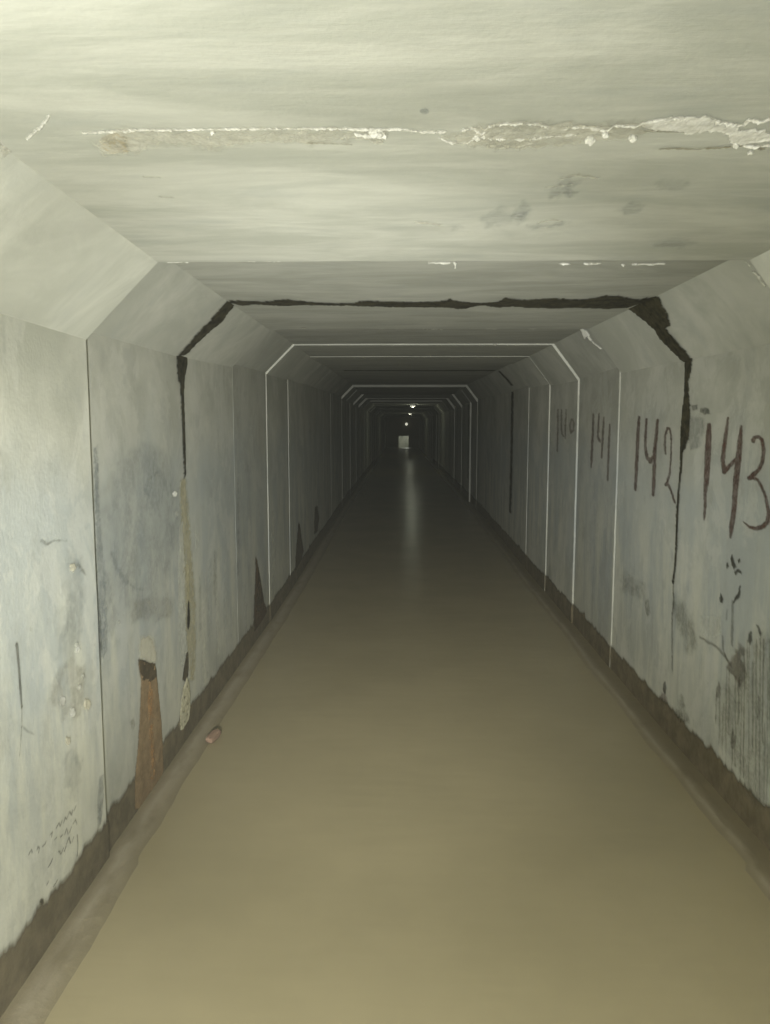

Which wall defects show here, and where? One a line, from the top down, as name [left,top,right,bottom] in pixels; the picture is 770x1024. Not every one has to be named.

crack [177,295,692,606]
water stain [97,602,106,646]
rust [134,637,164,810]
flaking render [180,678,190,731]
water stain [157,459,375,774]
water stain [433,459,770,851]
water stain [0,779,138,1018]